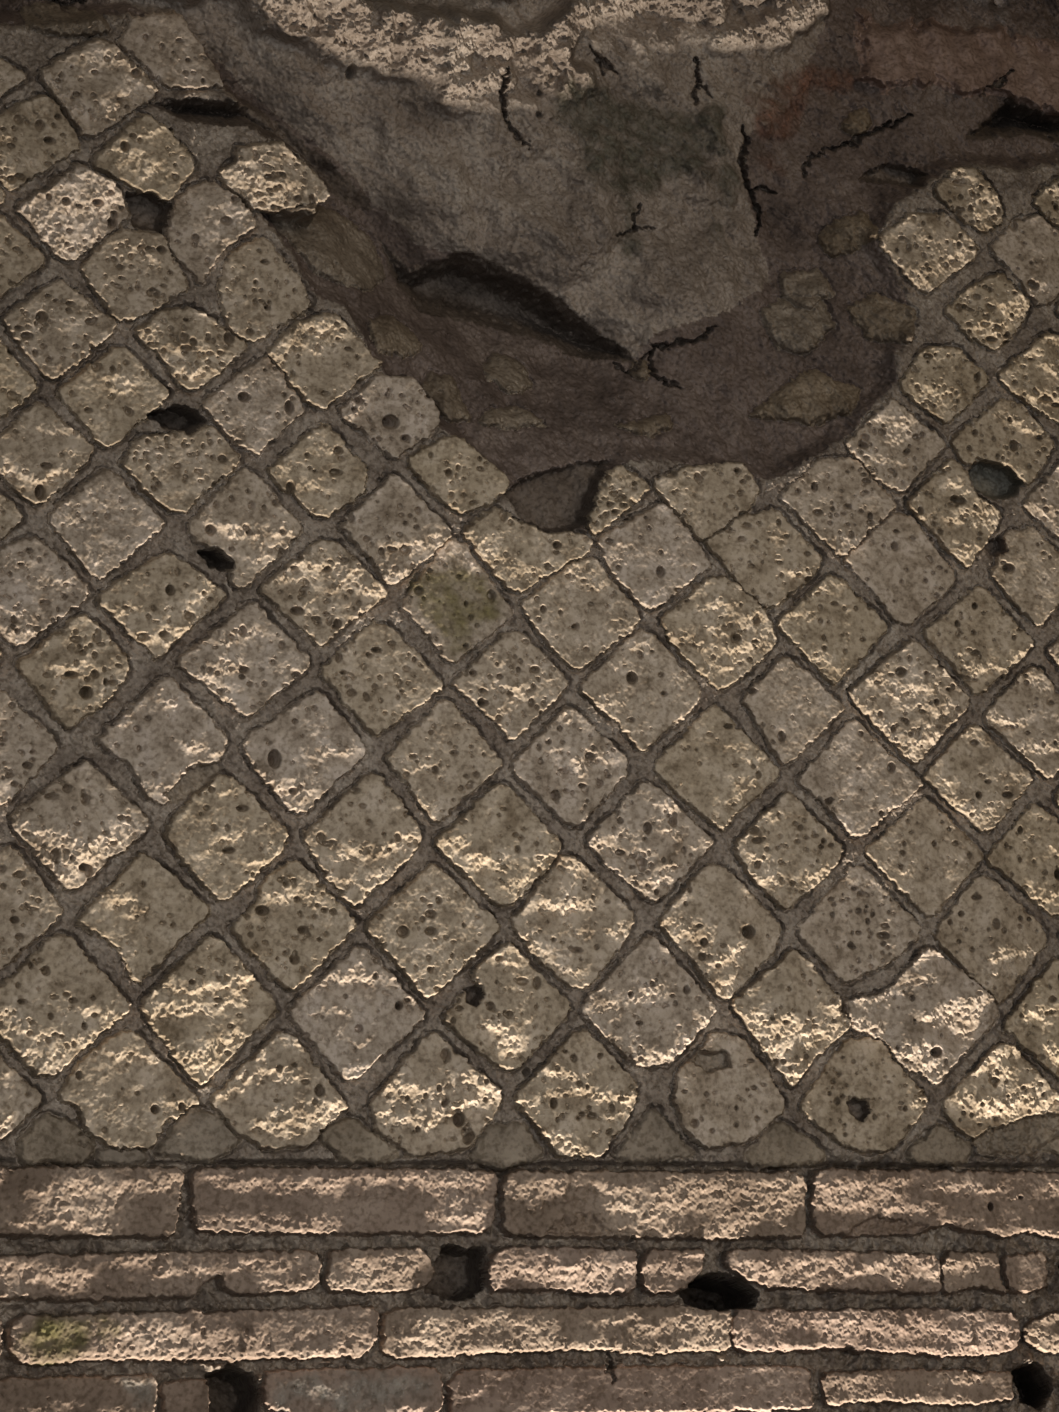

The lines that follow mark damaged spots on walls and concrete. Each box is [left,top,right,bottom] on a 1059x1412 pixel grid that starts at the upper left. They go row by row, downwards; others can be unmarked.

spalling [0,0,150,39]
crack [979,70,1015,97]
crack [737,114,914,237]
spalling [125,193,173,234]
spalling [147,0,1059,533]
crack [613,326,718,389]
spalling [984,537,1009,559]
spalling [424,1246,488,1301]
spalling [676,1275,756,1311]
spalling [205,1368,262,1412]
spalling [1011,1365,1051,1411]